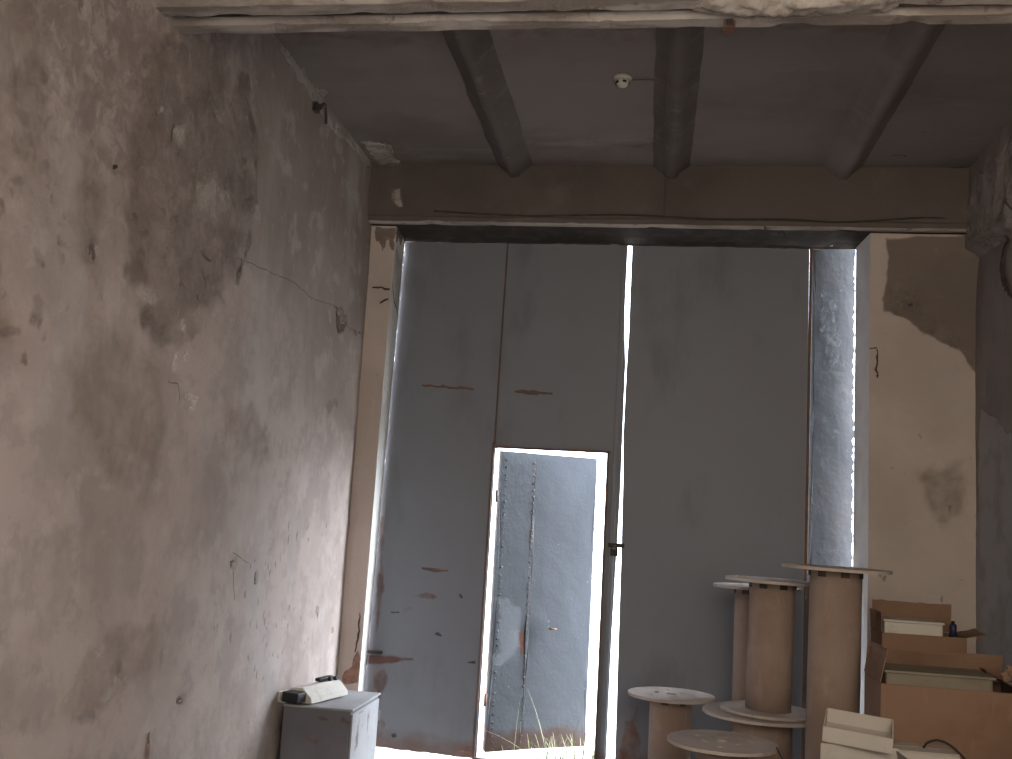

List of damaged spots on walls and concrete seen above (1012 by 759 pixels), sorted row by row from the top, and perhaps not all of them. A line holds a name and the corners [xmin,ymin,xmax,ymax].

damp [127,37,257,340]
corrosion [368,655,412,693]